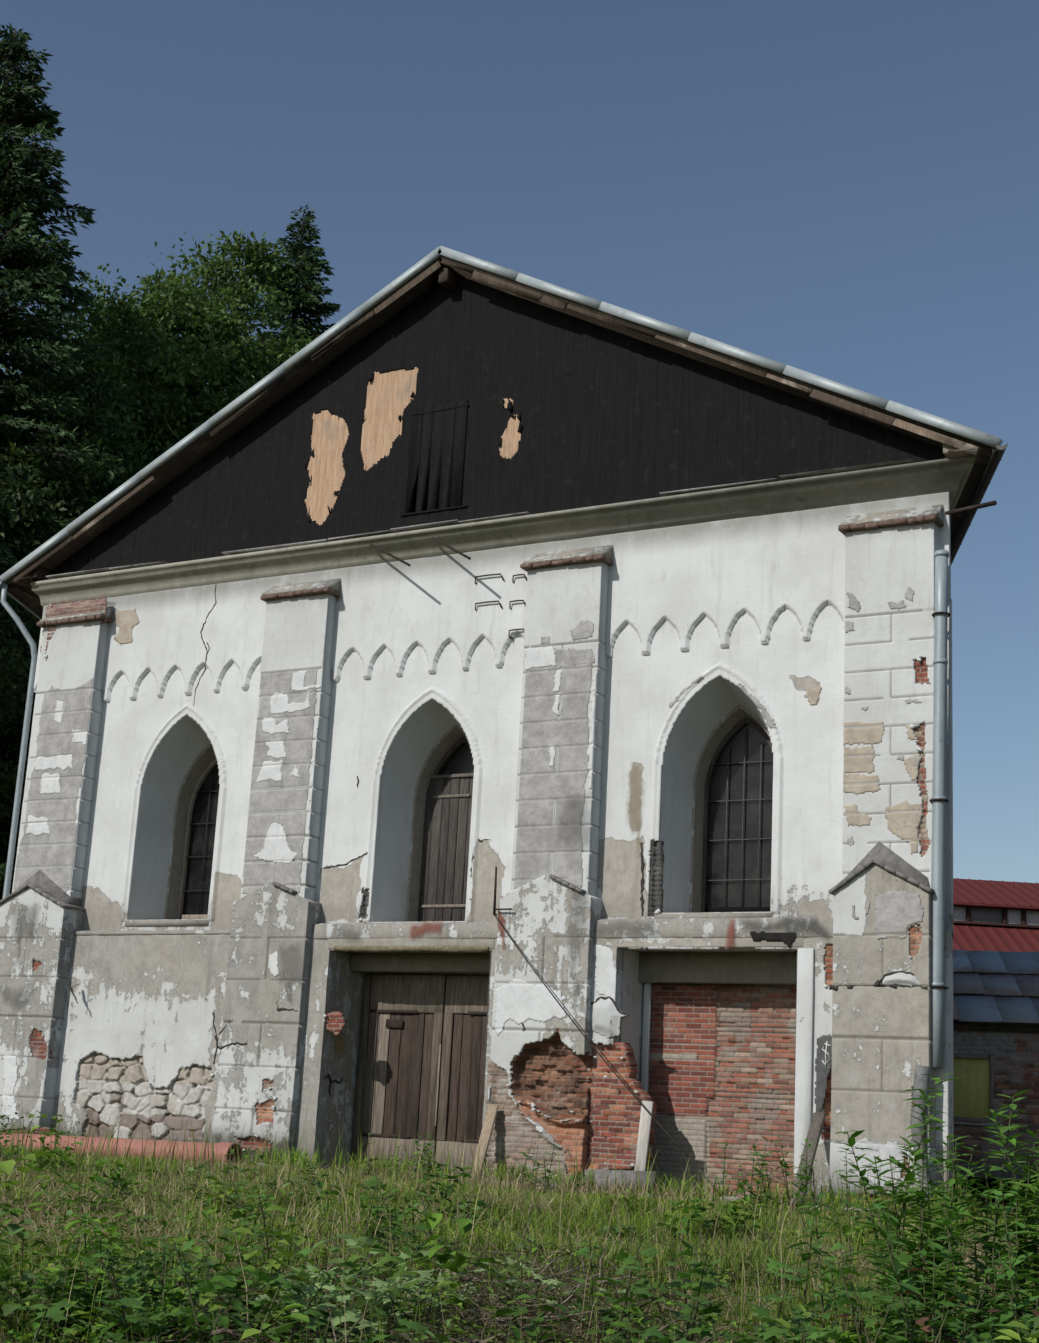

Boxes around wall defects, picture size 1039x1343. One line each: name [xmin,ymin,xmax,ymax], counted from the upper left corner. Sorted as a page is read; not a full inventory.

peeling [304,367,418,525]
peeling [498,397,522,459]
flaking render [40,595,140,661]
crack [193,585,216,706]
peeling [845,592,861,633]
spalling [905,655,930,704]
peeling [13,678,93,892]
peeling [242,668,321,894]
peeling [843,706,931,857]
spalling [29,1029,52,1060]
spalling [74,1051,213,1141]
flaking render [506,1029,657,1180]